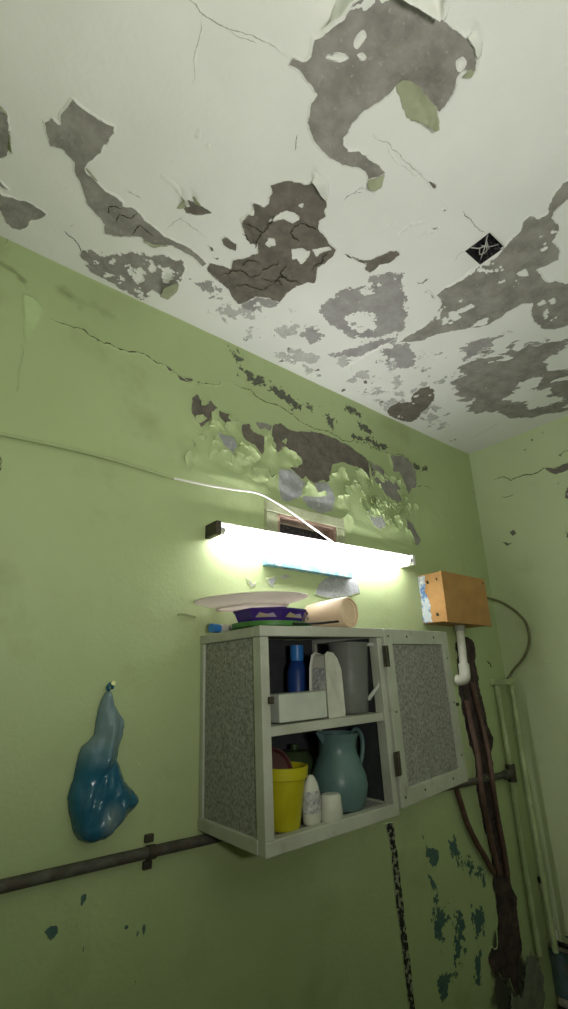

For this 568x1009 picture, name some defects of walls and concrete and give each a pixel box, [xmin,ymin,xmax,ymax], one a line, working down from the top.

crack [190,0,289,85]
flaking render [0,106,12,159]
flaking render [287,0,483,191]
flaking render [0,180,48,231]
flaking render [42,96,568,422]
crack [50,319,441,493]
flaking render [544,454,568,500]
flaking render [422,636,522,1002]
peeling [45,925,58,940]